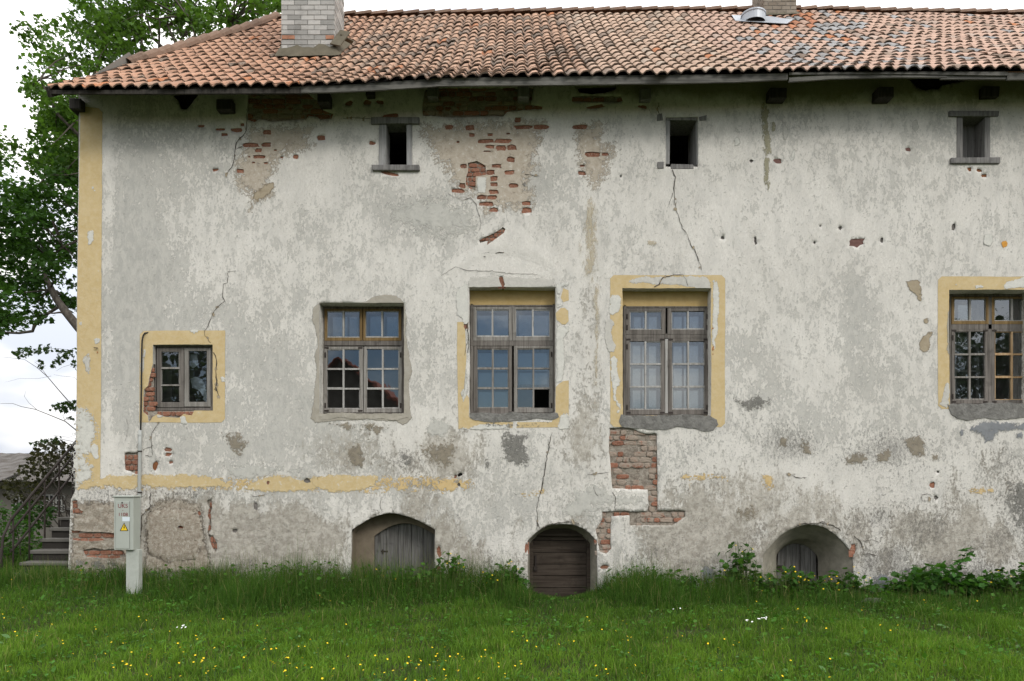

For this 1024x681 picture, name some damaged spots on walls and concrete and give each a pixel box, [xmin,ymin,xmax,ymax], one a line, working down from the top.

crack [225,113,247,177]
flaking render [198,94,333,213]
flaking render [417,88,549,218]
flaking render [572,88,623,191]
crack [654,169,702,287]
crack [204,271,232,398]
flaking render [140,349,194,424]
flaking render [68,499,126,575]
flaking render [125,452,138,474]
flaking render [140,496,217,574]
crack [536,434,579,528]
flaking render [563,428,685,569]